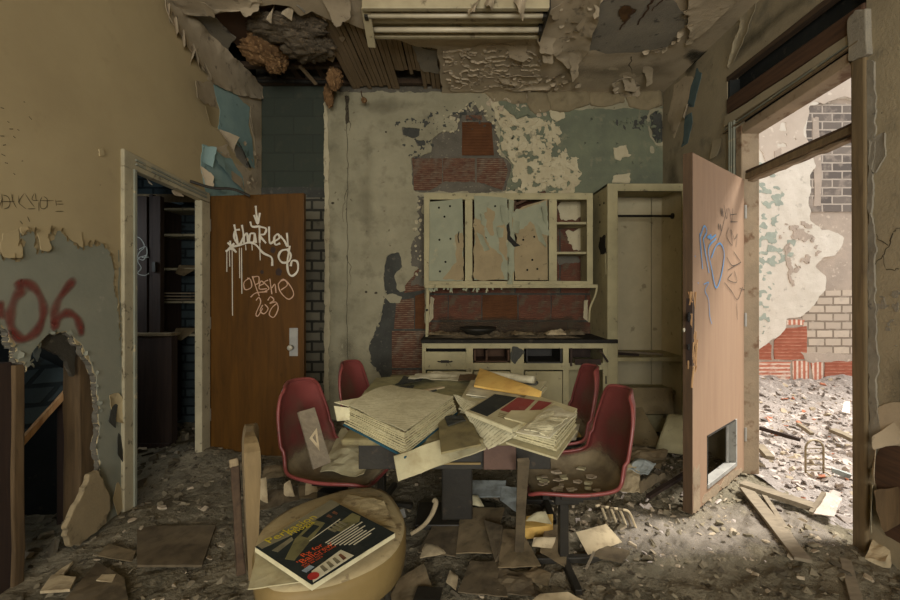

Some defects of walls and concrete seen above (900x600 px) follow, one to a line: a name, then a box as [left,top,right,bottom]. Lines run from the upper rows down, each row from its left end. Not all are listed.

peeling [165,0,263,196]
peeling [322,0,351,27]
spalling [365,0,737,385]
peeling [727,3,756,68]
spalling [759,78,851,165]
spalling [759,154,852,380]
peeling [0,225,125,523]